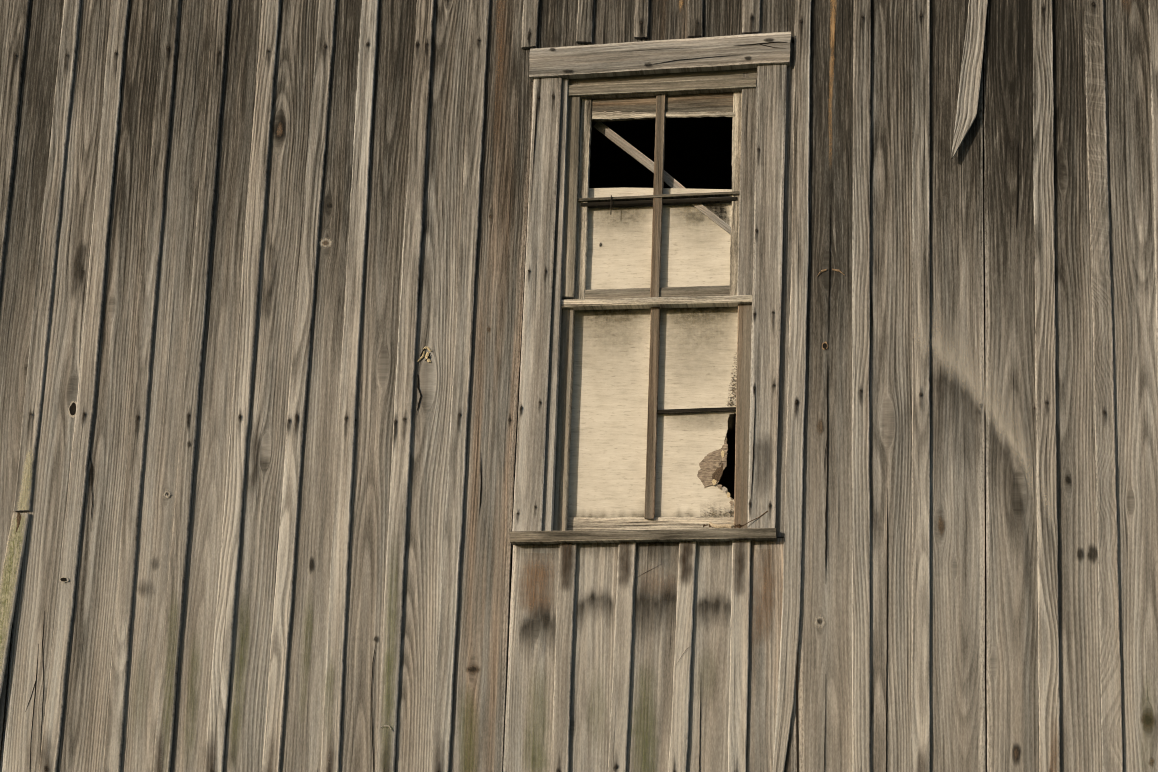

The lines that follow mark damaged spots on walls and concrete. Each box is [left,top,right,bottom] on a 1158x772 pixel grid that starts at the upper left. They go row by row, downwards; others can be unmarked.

leakage [562,543,572,586]
leakage [621,542,629,581]
leakage [648,541,699,581]
leakage [726,541,744,586]
leakage [519,611,554,637]
leakage [576,592,611,616]
leakage [635,587,676,621]
leakage [699,597,730,614]